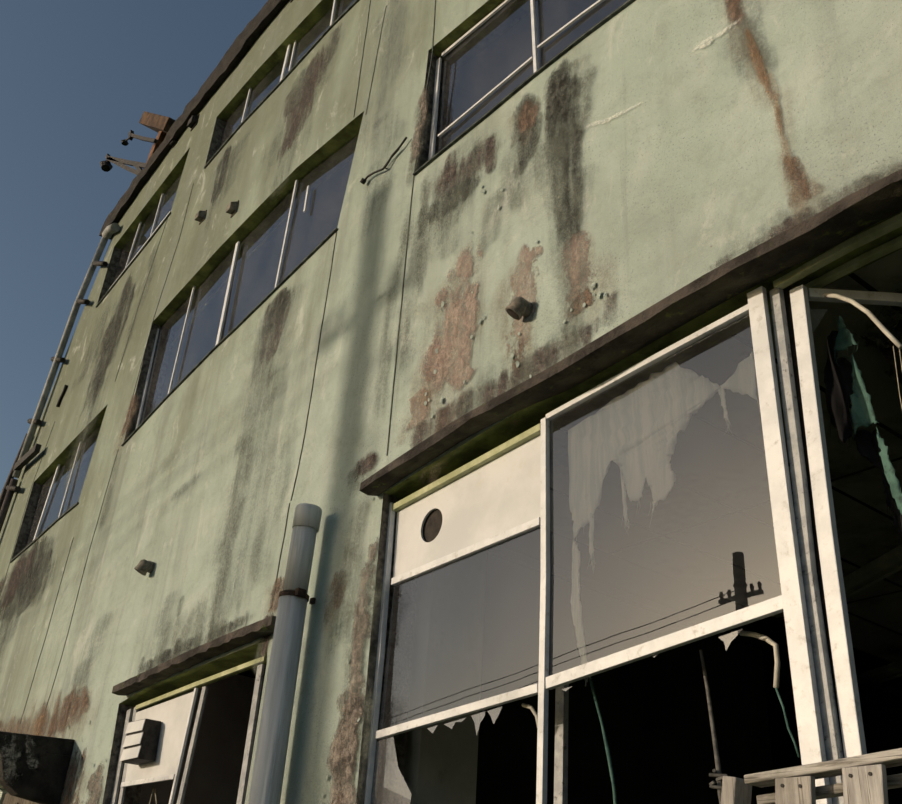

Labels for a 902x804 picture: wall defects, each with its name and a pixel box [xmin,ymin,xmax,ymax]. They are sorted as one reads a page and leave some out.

damp [79,278,135,439]
damp [274,31,338,153]
peeling [406,247,484,431]
damp [416,135,496,286]
peeling [506,239,542,379]
damp [513,60,583,245]
peeling [563,231,606,324]
corrosion [725,0,816,202]
damp [0,543,52,647]
spalling [320,538,378,804]
spalling [0,734,40,786]
peeling [59,750,105,804]